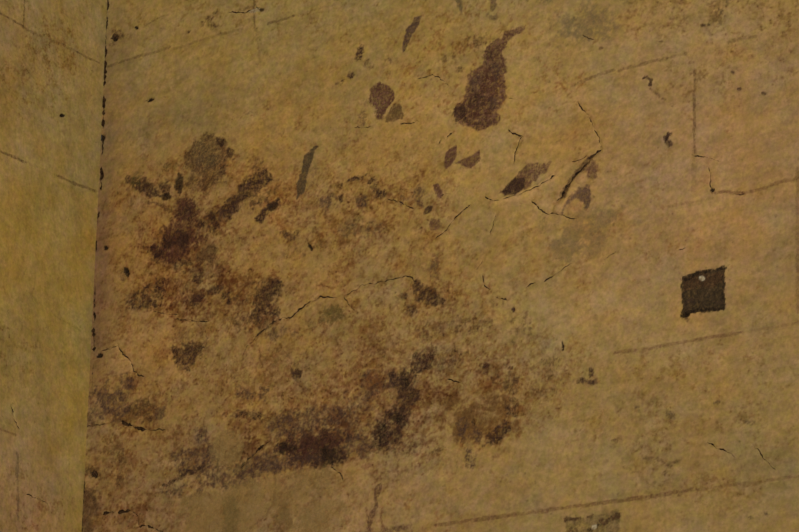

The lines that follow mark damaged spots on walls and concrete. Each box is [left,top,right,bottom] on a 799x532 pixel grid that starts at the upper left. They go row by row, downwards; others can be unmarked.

leakage [126,134,234,200]
leakage [198,167,280,231]
leakage [297,146,317,198]
leakage [320,176,386,208]
leakage [445,146,480,169]
crack [436,103,601,238]
leakage [500,163,549,195]
leakage [183,263,283,337]
crack [242,276,416,356]
leakage [404,280,445,316]
leakage [172,343,204,371]
leakage [162,354,433,495]